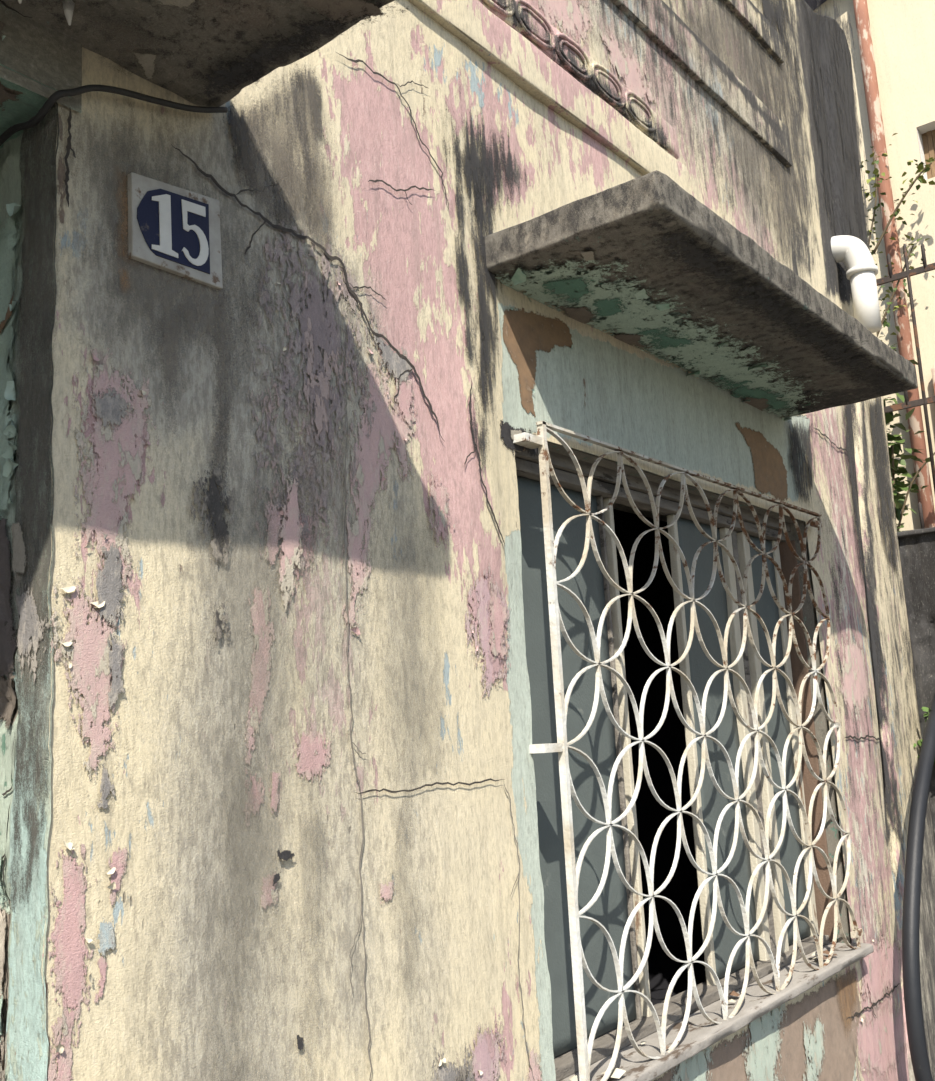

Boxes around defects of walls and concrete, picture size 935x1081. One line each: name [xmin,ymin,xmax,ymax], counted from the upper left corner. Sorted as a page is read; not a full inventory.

crack [336,52,449,209]
leakage [663,0,873,254]
peeling [243,218,418,771]
crack [171,144,535,1081]
leakage [444,107,527,468]
spalling [500,419,539,457]
peeling [495,251,832,422]
leakage [629,210,910,846]
spalling [0,883,8,1081]
peeling [41,841,128,1081]
peeling [655,930,907,1081]
crack [846,983,899,1081]